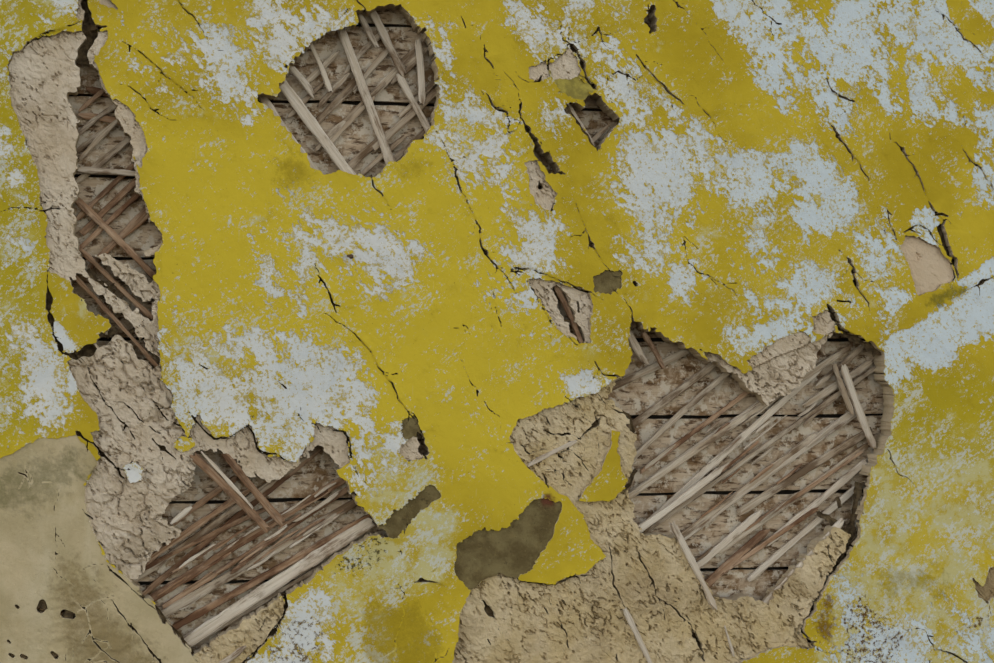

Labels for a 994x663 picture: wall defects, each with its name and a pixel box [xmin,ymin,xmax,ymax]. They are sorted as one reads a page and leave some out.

crack [20,0,204,119]
crack [178,0,224,51]
peeling [158,0,622,344]
crack [827,80,870,185]
crack [885,138,994,297]
crack [932,0,991,61]
crack [959,112,993,189]
flaking render [0,0,441,663]
crack [314,263,418,427]
crack [437,132,636,488]
flaking render [452,0,994,663]
crack [827,250,885,357]